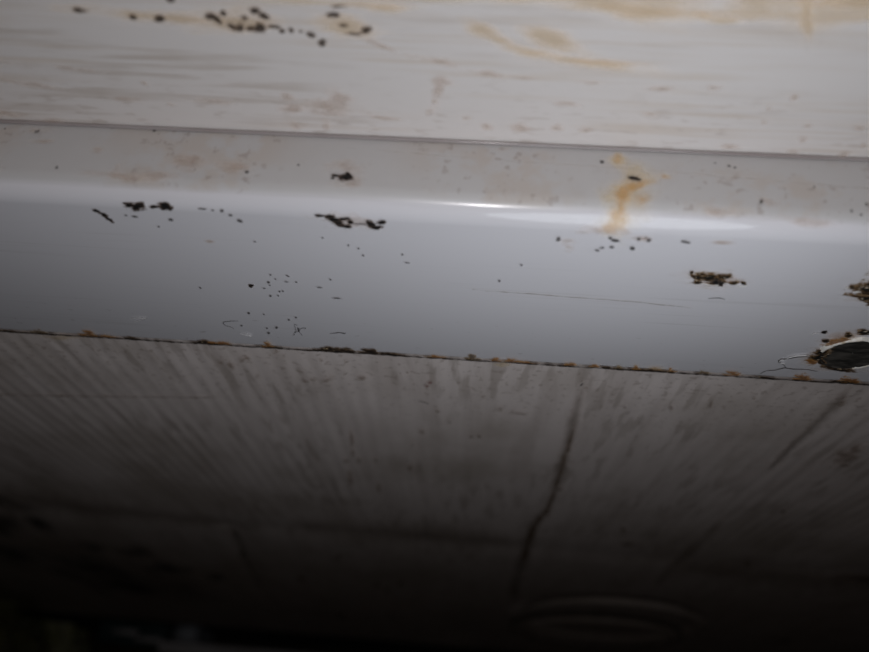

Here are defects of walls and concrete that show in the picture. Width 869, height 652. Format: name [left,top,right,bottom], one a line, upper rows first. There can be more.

damp [205,8,326,47]
damp [327,5,372,35]